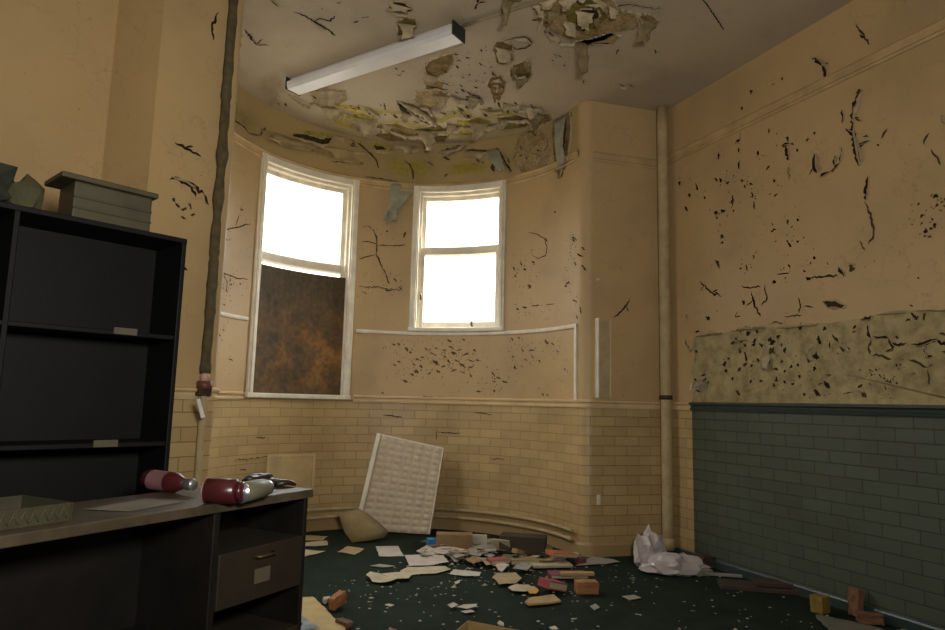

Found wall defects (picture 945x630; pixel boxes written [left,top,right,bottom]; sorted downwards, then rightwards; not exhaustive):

peeling [235,0,663,225]
crack [357,226,406,297]
peeling [383,337,559,395]